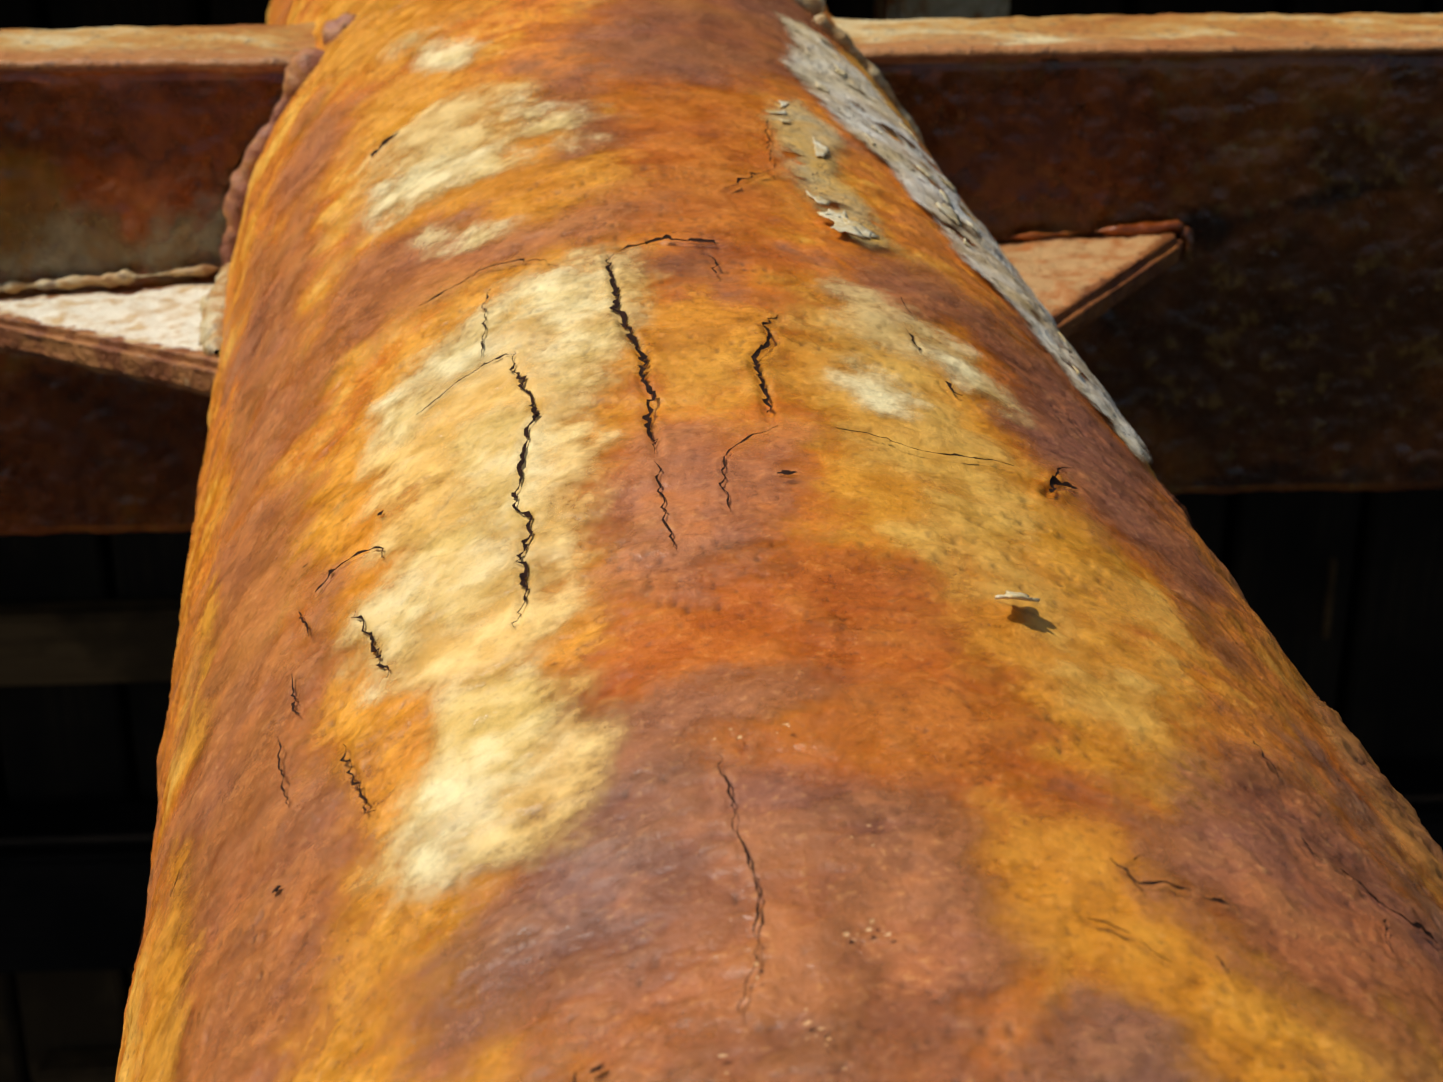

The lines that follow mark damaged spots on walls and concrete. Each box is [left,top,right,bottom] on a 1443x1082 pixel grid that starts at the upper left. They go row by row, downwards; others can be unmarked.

corrosion [0,80,267,189]
peeling [766,14,1150,457]
corrosion [0,375,209,527]
crack [299,546,384,636]
crack [351,611,389,678]
crack [417,259,558,627]
crack [605,234,719,549]
corrosion [164,0,1237,1082]
crack [718,314,778,511]
crack [340,744,375,814]
crack [718,755,760,1014]
corrosion [1135,742,1443,1082]